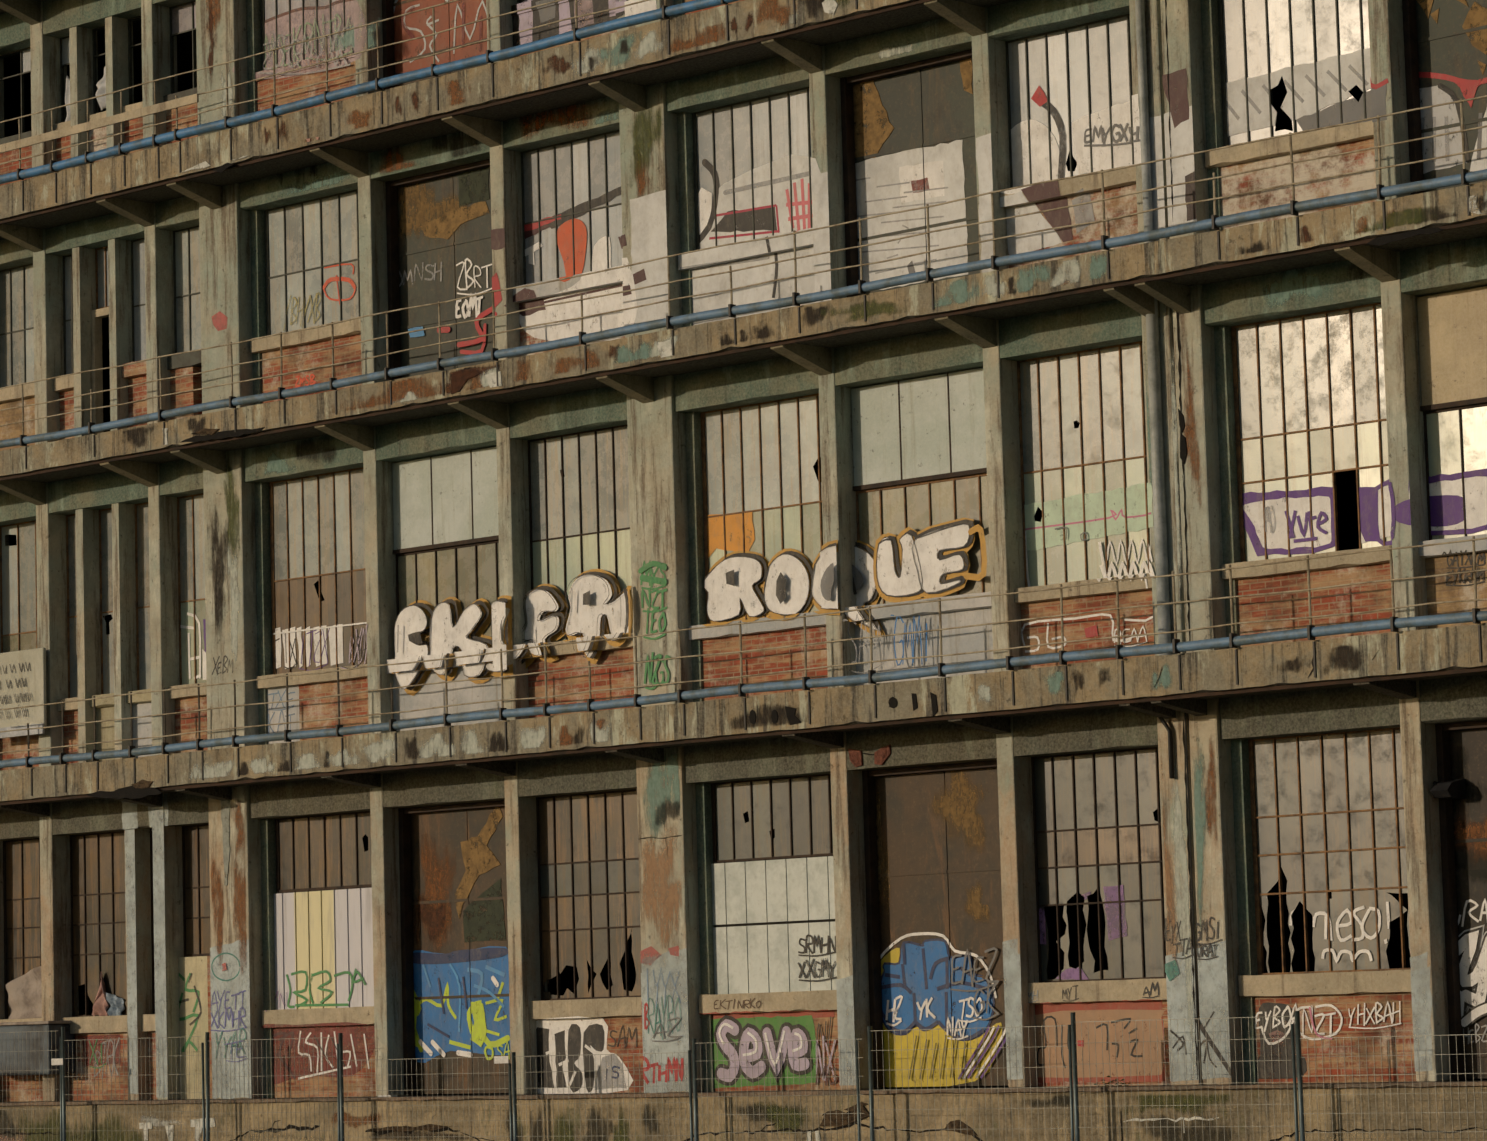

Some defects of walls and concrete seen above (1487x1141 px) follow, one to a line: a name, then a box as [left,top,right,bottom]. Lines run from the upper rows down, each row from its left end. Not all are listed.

damp [207,459,240,661]
corrosion [211,802,247,971]
crack [1183,723,1198,1079]
damp [0,1110,142,1141]
crack [230,1120,319,1141]
crack [684,1120,983,1141]
crack [1120,1111,1219,1141]
crack [1270,1127,1487,1141]